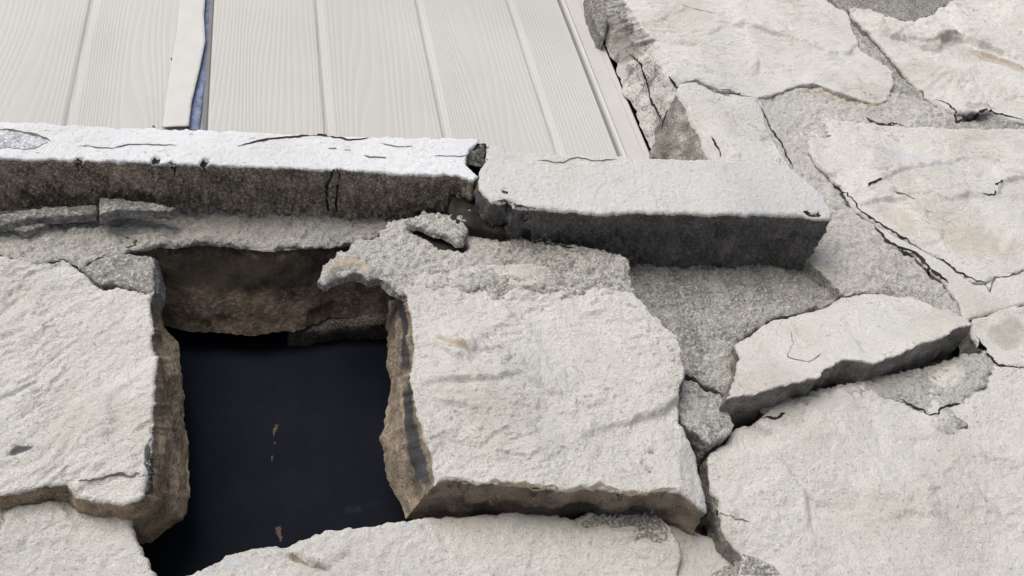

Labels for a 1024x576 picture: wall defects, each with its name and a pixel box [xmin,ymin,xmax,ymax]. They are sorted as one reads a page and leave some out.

crack [625,50,793,166]
crack [866,117,904,126]
crack [938,100,1023,124]
crack [80,142,173,150]
crack [237,133,408,213]
crack [542,156,614,164]
crack [840,178,1023,292]
water stain [399,305,410,370]
crack [976,336,1024,368]
crack [691,375,722,394]
crack [902,399,960,415]
water stain [403,389,429,485]